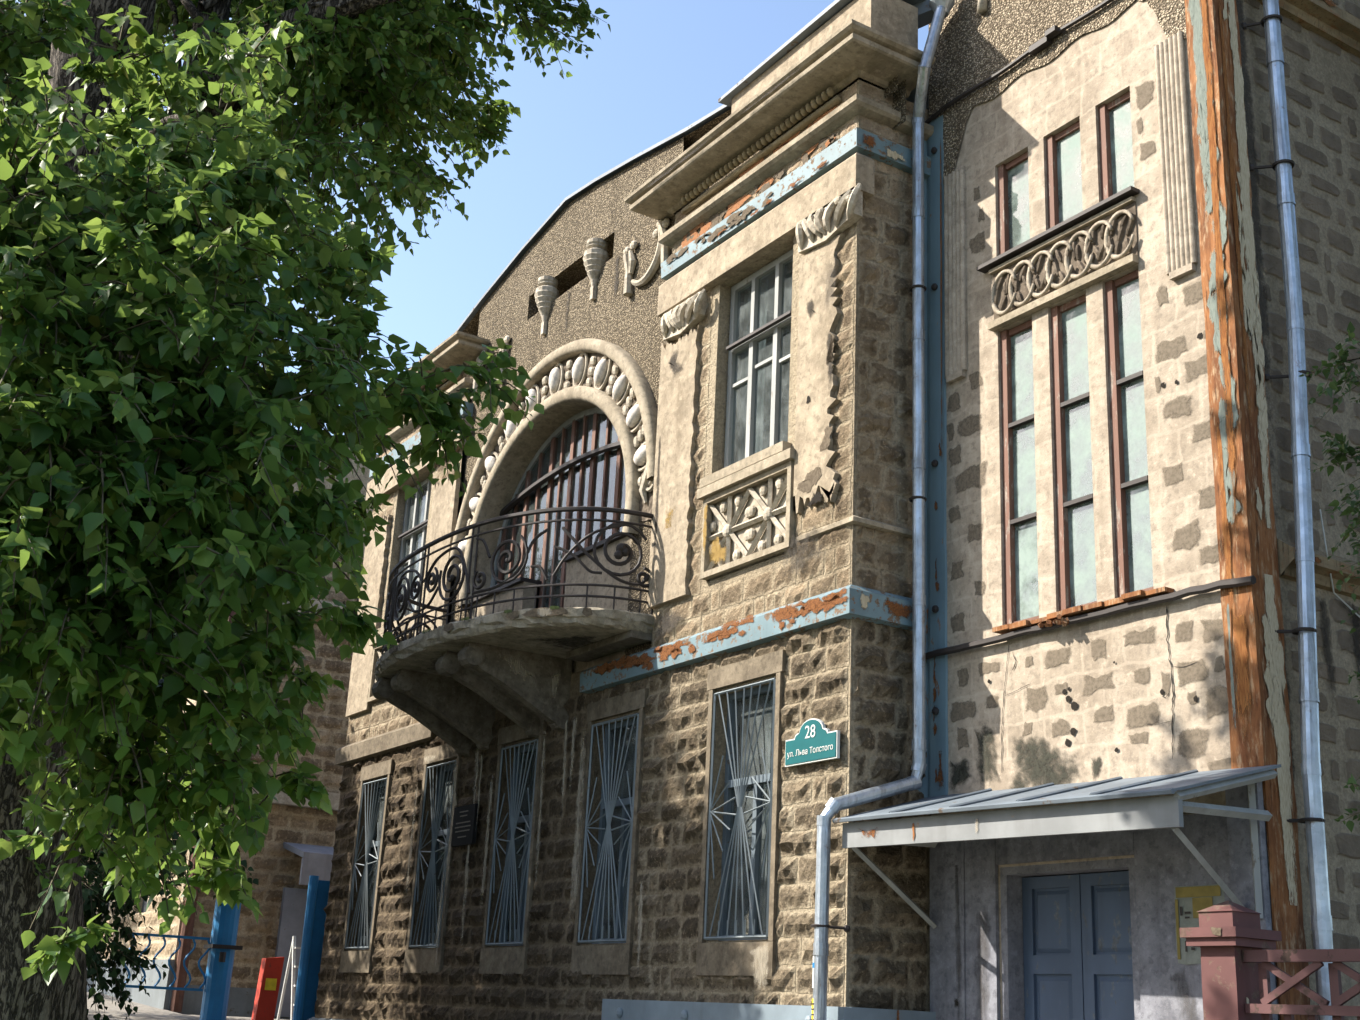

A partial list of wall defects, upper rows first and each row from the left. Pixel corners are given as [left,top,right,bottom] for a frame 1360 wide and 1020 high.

spalling [666,105,837,264]
peeling [1155,0,1271,565]
spalling [504,606,592,619]
mould [950,726,997,788]
mould [1011,737,1101,789]
crack [1157,607,1196,758]
peeling [1262,574,1298,906]